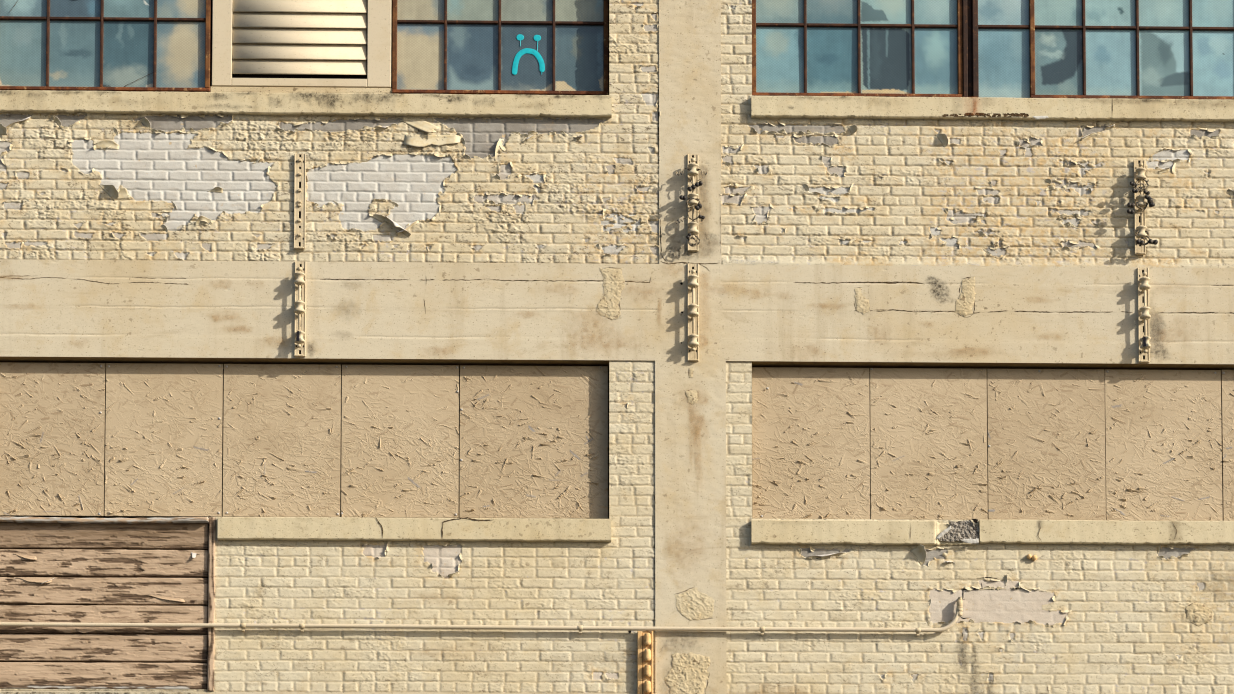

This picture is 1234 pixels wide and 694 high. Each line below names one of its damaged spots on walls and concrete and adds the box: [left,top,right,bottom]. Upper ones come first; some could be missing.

peeling [0,113,32,210]
peeling [50,113,277,256]
peeling [276,116,607,250]
peeling [930,180,1009,258]
spalling [934,113,1048,165]
peeling [1036,160,1103,250]
peeling [1080,123,1115,141]
peeling [1146,127,1222,174]
spalling [911,519,979,567]
peeling [927,575,1071,641]